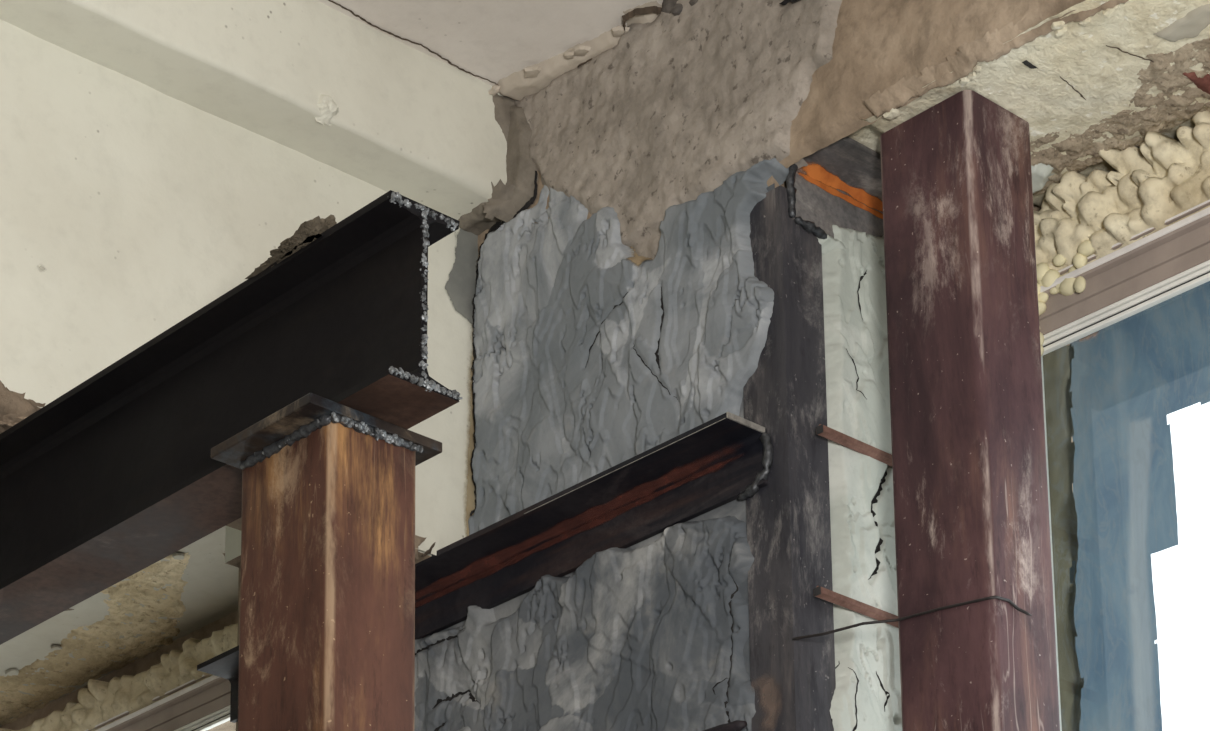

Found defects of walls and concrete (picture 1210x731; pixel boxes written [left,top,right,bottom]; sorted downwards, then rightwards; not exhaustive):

crack [328,0,498,85]
flaking render [458,0,842,260]
flaking render [862,0,1129,119]
flaking render [1030,4,1210,195]
crack [857,270,867,320]
flaking render [0,381,46,434]
crack [846,349,866,398]
rust [415,449,732,608]
crack [868,471,887,580]
peeling [0,552,191,726]
crack [831,663,890,731]